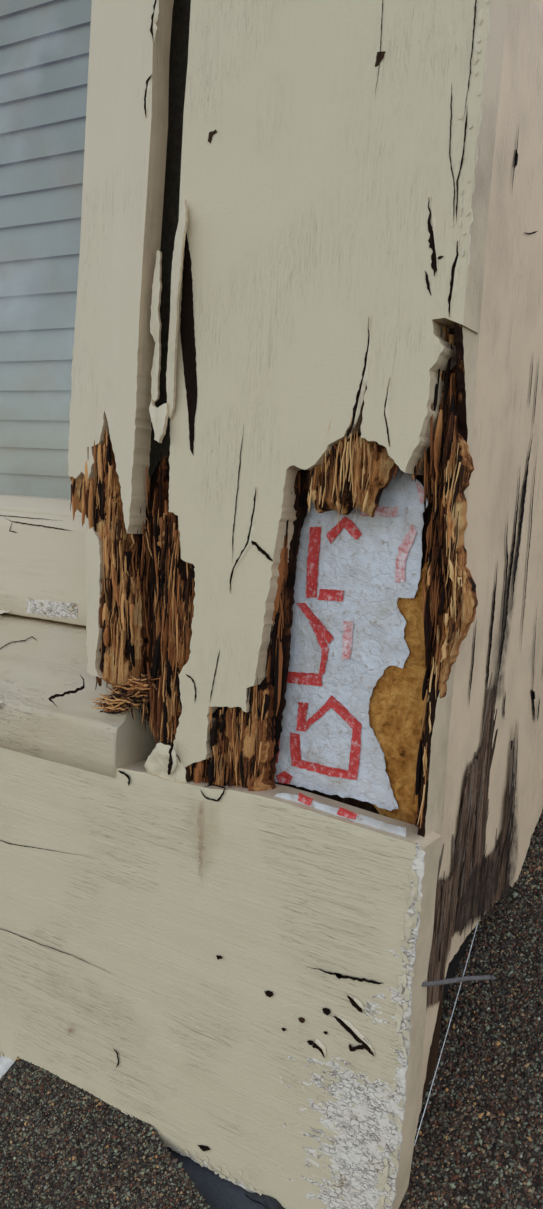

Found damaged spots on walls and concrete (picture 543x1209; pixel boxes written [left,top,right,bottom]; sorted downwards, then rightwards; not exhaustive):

crack [425,0,477,315]
peeling [149,199,188,443]
crack [230,428,273,589]
crack [1,929,105,971]
crack [307,967,382,1058]
peeling [277,842,426,1209]